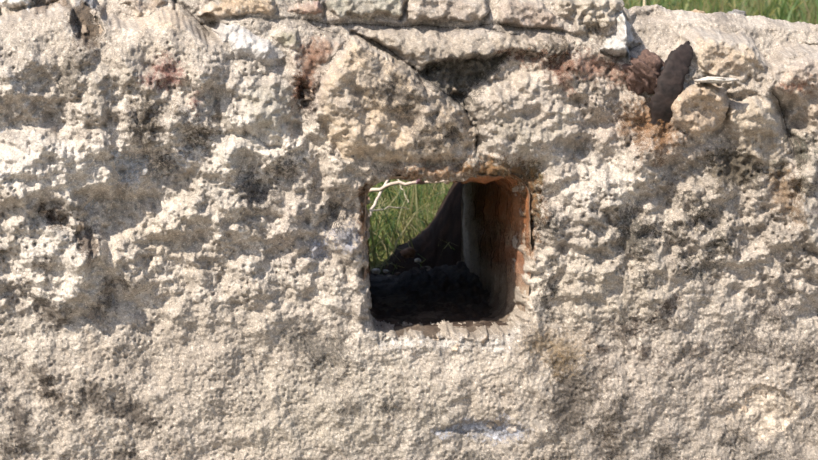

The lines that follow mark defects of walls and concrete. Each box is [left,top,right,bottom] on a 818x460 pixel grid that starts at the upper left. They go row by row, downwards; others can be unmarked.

corrosion [293,37,328,100]
crack [281,18,563,148]
corrosion [382,157,546,289]
leakage [537,293,710,460]
leakage [721,285,818,394]
leakage [453,441,509,460]